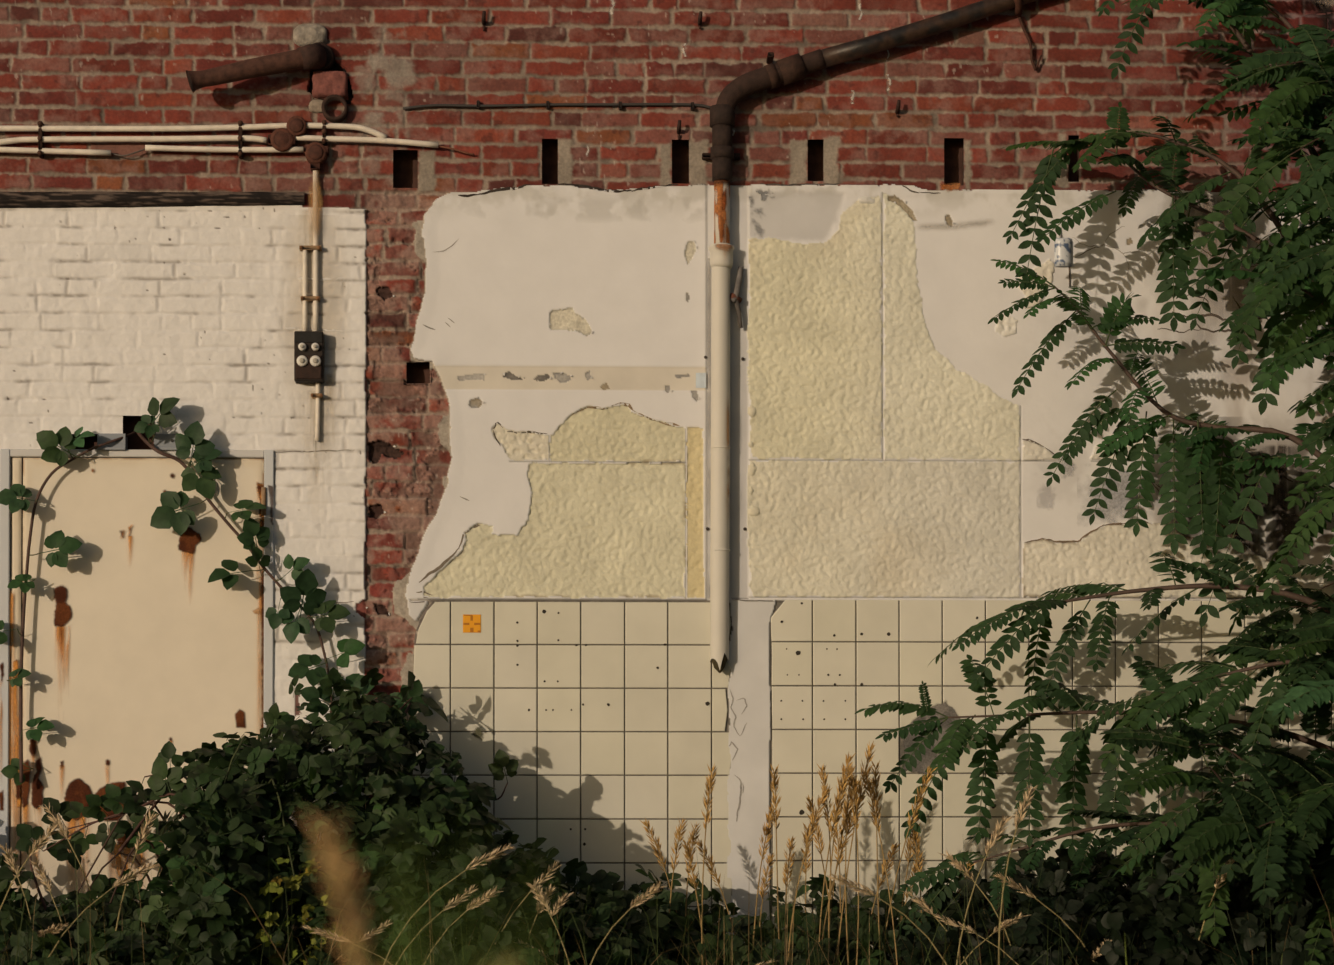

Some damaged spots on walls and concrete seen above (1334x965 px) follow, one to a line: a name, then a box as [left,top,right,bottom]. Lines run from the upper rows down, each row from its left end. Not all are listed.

rust [714,179,732,249]
spalling [888,195,918,221]
spalling [377,287,394,301]
spalling [550,308,593,337]
hole [404,362,430,385]
spalling [368,441,405,464]
spalling [369,505,386,519]
rust [178,527,201,561]
rust [54,586,71,658]
peeling [357,600,390,619]
rust [0,660,44,824]
rust [60,761,162,875]